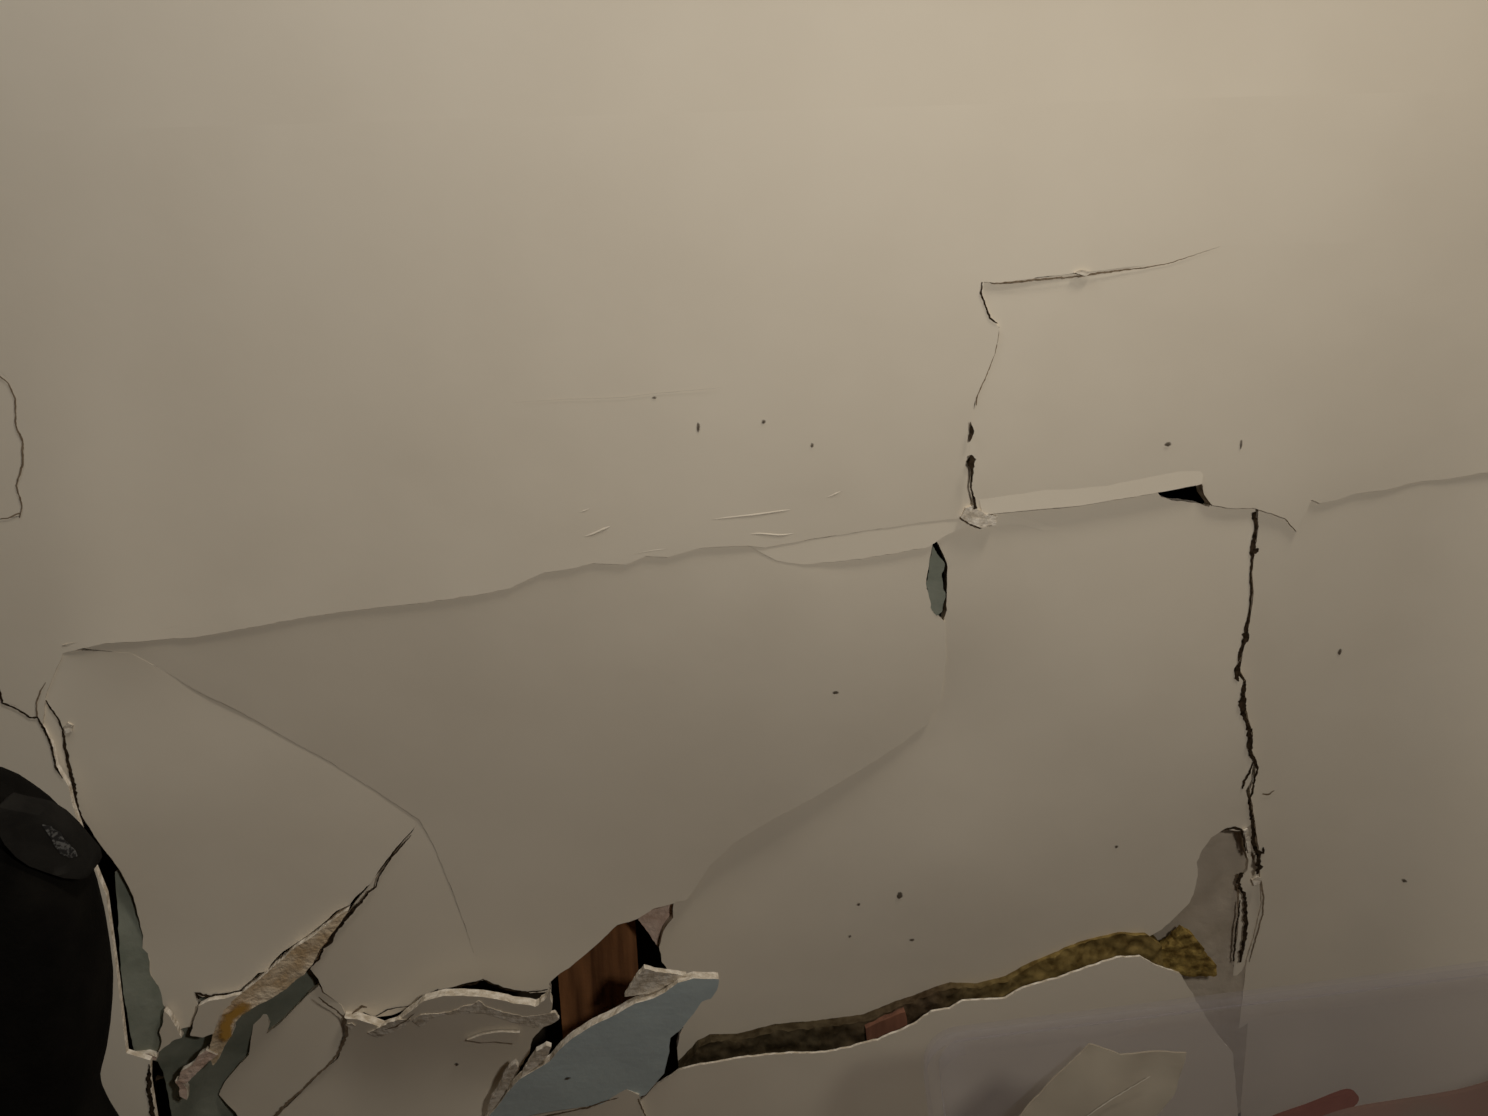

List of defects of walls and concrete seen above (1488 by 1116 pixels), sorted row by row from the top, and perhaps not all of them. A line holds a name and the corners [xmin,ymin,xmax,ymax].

crack [0,376,24,519]
crack [966,247,1218,509]
peeling [750,471,1204,616]
crack [0,682,85,825]
crack [1225,511,1274,963]
crack [193,990,243,1021]
peeling [81,815,359,1116]
crack [274,835,559,1116]
spalling [441,975,563,1115]
spalling [625,904,687,997]
spalling [656,1031,679,1083]
spalling [1153,825,1261,1113]